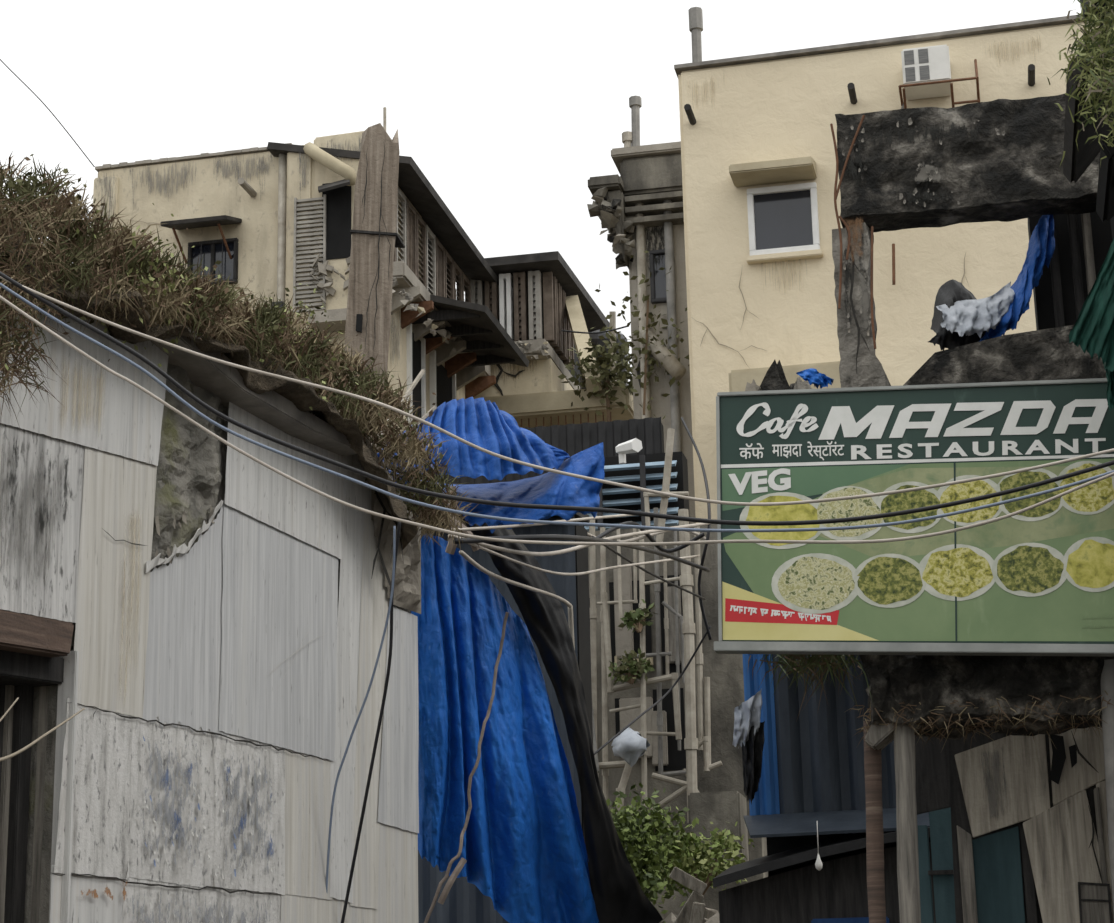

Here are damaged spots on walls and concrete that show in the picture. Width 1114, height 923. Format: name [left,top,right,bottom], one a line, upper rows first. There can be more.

damp [217,155,272,181]
damp [0,441,68,580]
peeling [150,363,224,572]